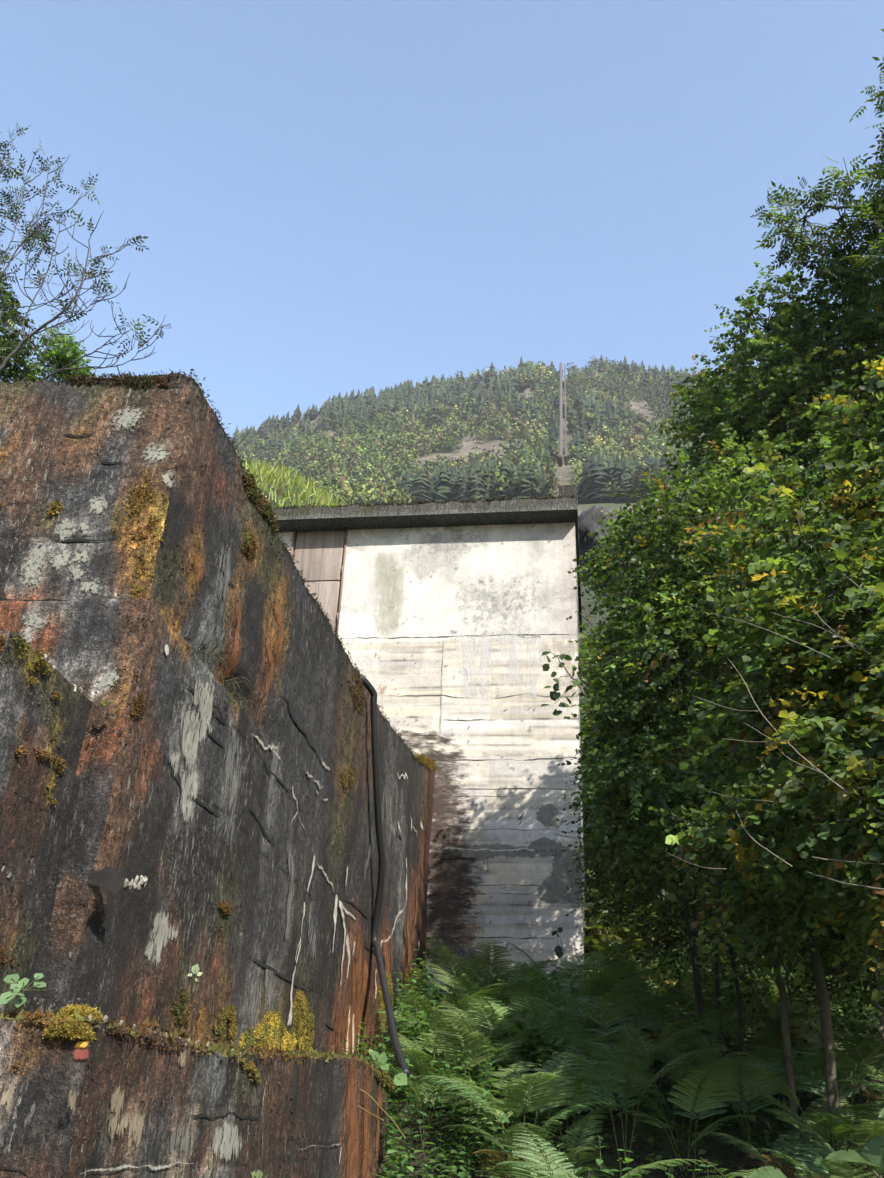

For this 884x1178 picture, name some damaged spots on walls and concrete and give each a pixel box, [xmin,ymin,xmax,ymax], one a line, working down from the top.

peeling [169,681,214,822]
peeling [221,736,242,844]
damp [245,952,275,1031]
damp [285,844,317,1026]
damp [332,895,356,985]
damp [346,1008,359,1053]
damp [381,858,407,944]
damp [398,752,585,973]